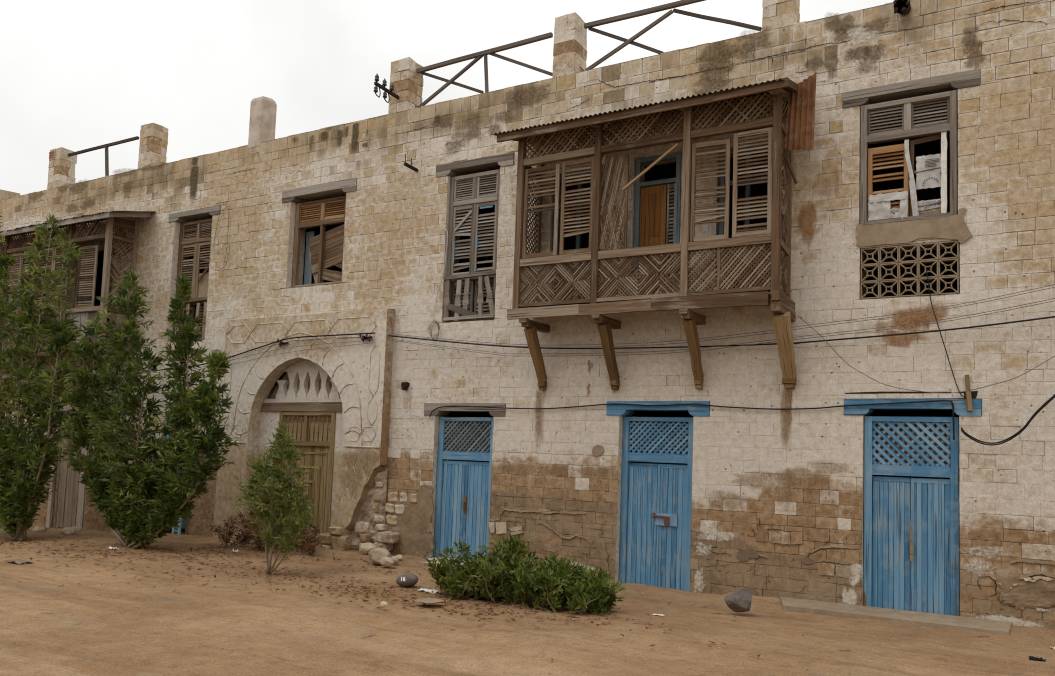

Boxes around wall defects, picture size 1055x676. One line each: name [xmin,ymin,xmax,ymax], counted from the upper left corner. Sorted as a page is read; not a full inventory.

mould [694,27,768,95]
mould [805,14,888,76]
water stain [963,27,985,68]
rust [799,205,815,239]
rust [880,305,946,346]
spalling [319,468,417,553]
spalling [488,522,524,535]
spalling [737,529,803,561]
spalling [810,549,859,578]
crack [977,559,1055,607]
spalling [997,575,1055,612]